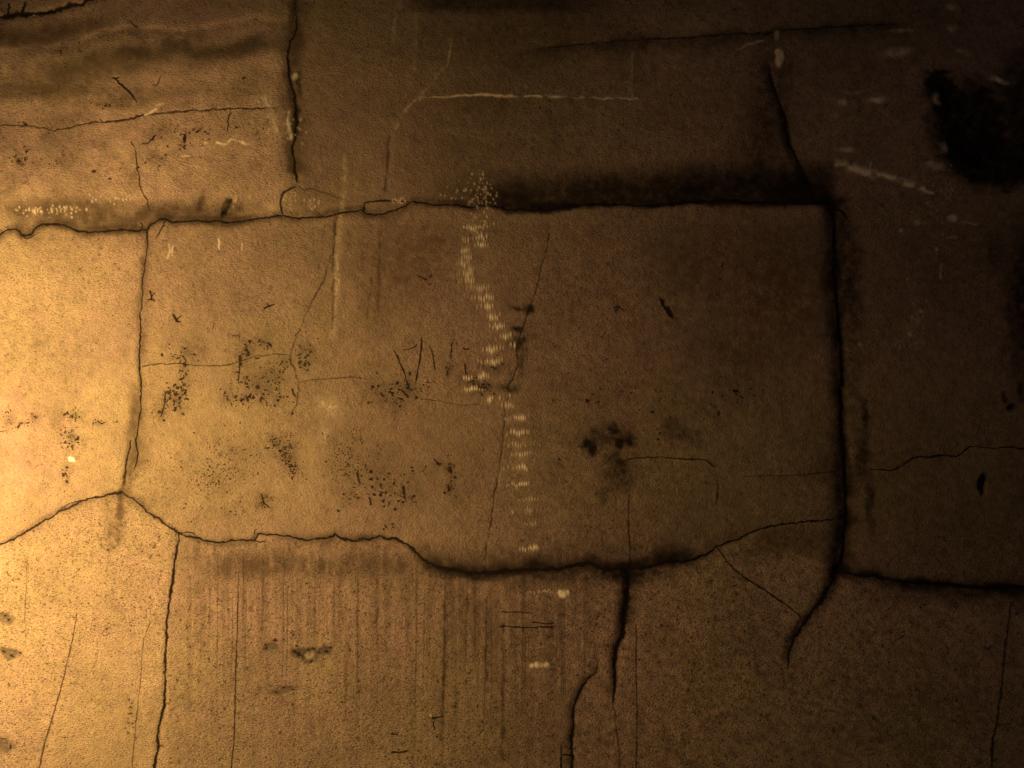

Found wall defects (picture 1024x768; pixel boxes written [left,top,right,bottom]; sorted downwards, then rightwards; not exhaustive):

crack [0,25,826,483]
leakage [461,223,526,436]
crack [0,206,1024,768]
leakage [836,148,934,194]